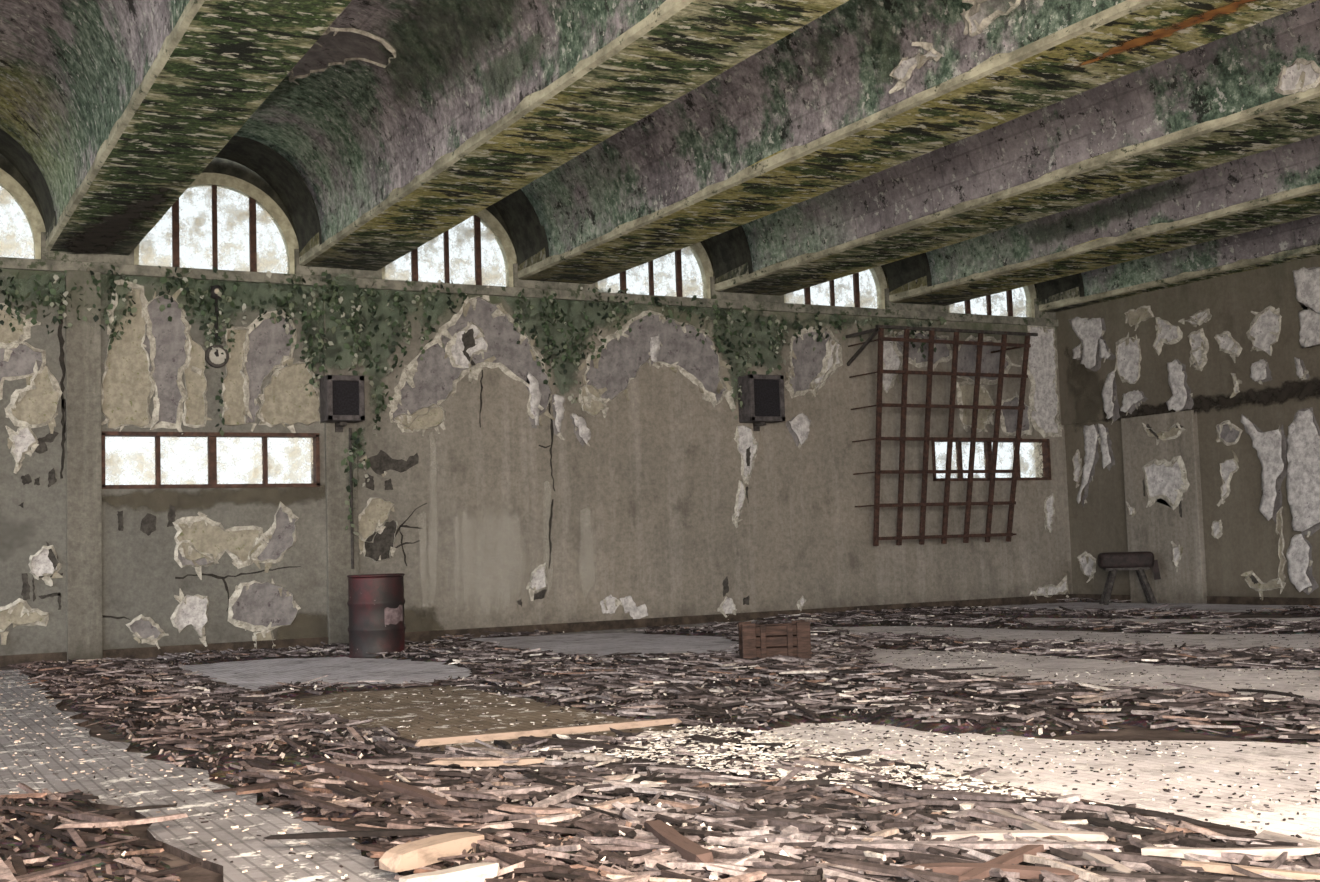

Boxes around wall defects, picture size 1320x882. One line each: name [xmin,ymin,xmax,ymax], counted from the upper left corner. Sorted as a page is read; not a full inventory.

rust [1077,0,1258,67]
peeling [0,303,62,488]
peeling [0,542,63,645]
peeling [101,279,320,434]
peeling [125,501,301,649]
peeling [358,450,419,562]
peeling [387,285,736,447]
peeling [732,425,758,528]
peeling [1029,551,1096,600]
peeling [875,306,1282,518]
peeling [1211,407,1320,600]
peeling [1293,267,1320,380]